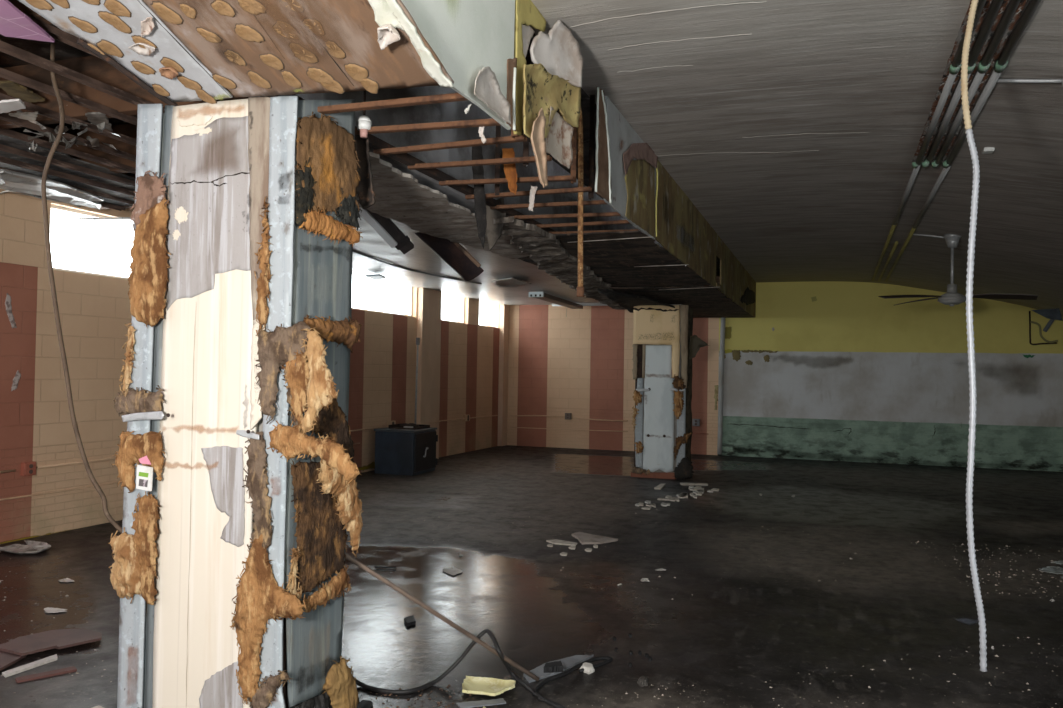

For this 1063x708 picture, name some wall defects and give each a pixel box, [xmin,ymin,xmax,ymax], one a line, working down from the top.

peeling [166,113,251,310]
peeling [201,446,245,547]
peeling [199,661,243,708]